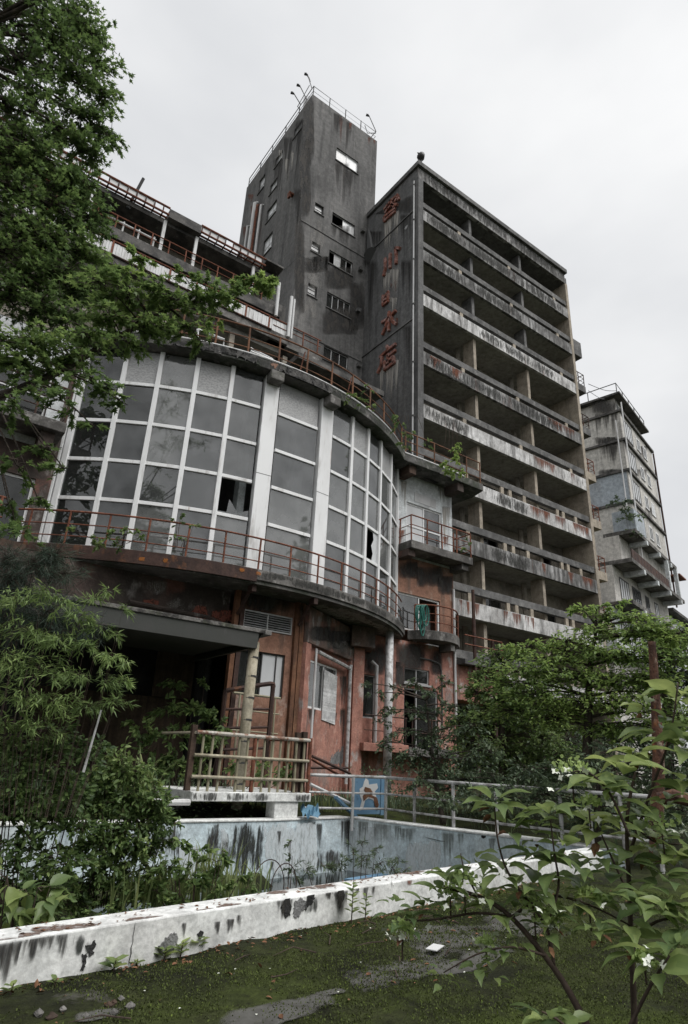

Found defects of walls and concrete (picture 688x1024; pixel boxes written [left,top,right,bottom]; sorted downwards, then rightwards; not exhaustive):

leakage [274,98,411,335]
leakage [208,823,274,875]
peeling [264,822,336,919]
leakage [0,934,67,978]